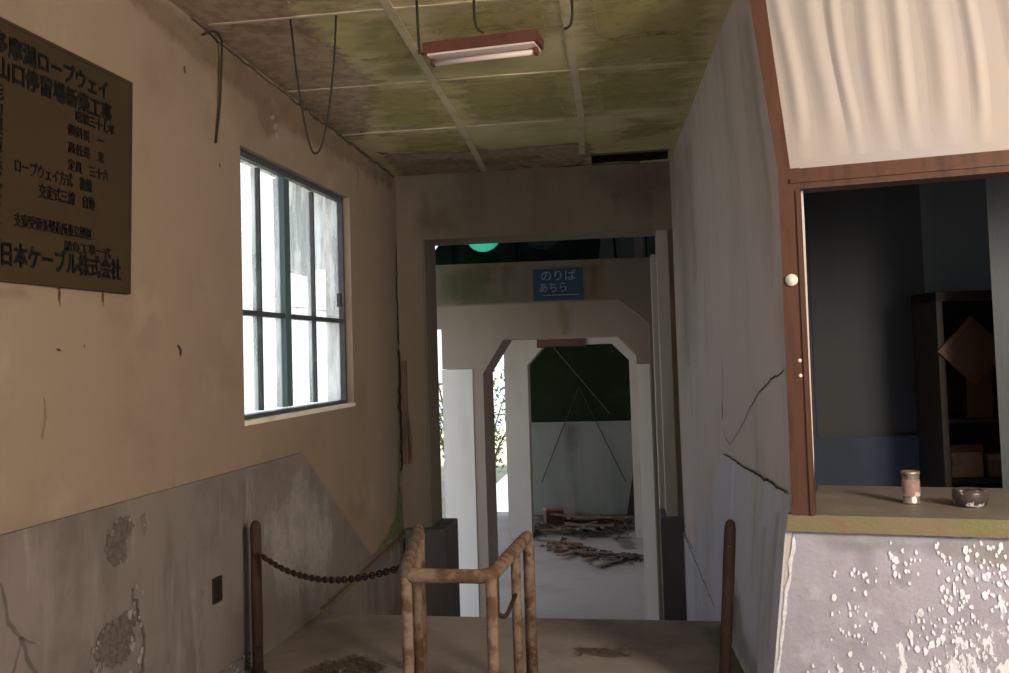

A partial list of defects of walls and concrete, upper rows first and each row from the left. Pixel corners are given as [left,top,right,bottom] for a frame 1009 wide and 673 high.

water stain [135,0,593,187]
crack [723,369,786,494]
spalling [104,512,146,566]
spalling [91,584,146,673]
water stain [776,536,796,673]